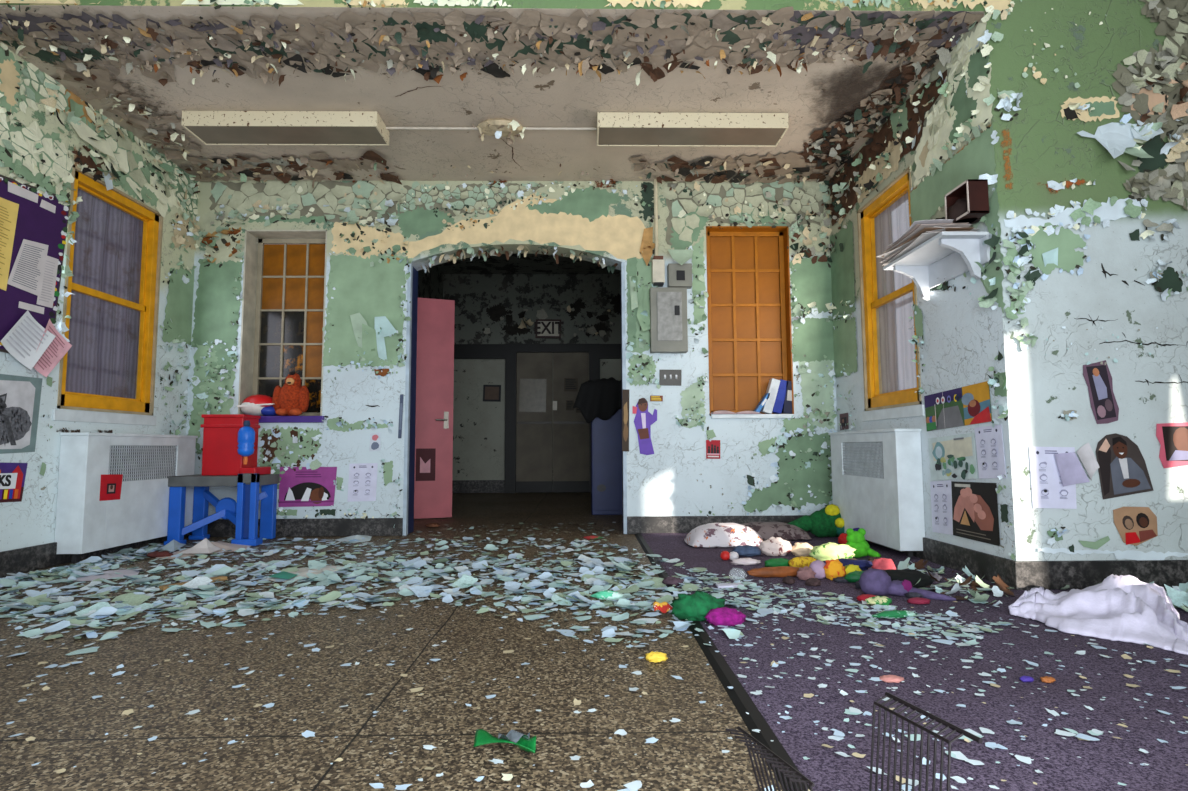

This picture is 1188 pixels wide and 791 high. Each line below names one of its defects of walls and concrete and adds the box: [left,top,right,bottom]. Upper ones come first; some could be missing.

peeling [0,0,1188,528]
crack [1101,263,1145,286]
crack [1075,314,1187,346]
crack [1136,375,1188,385]
peeling [995,466,1016,560]